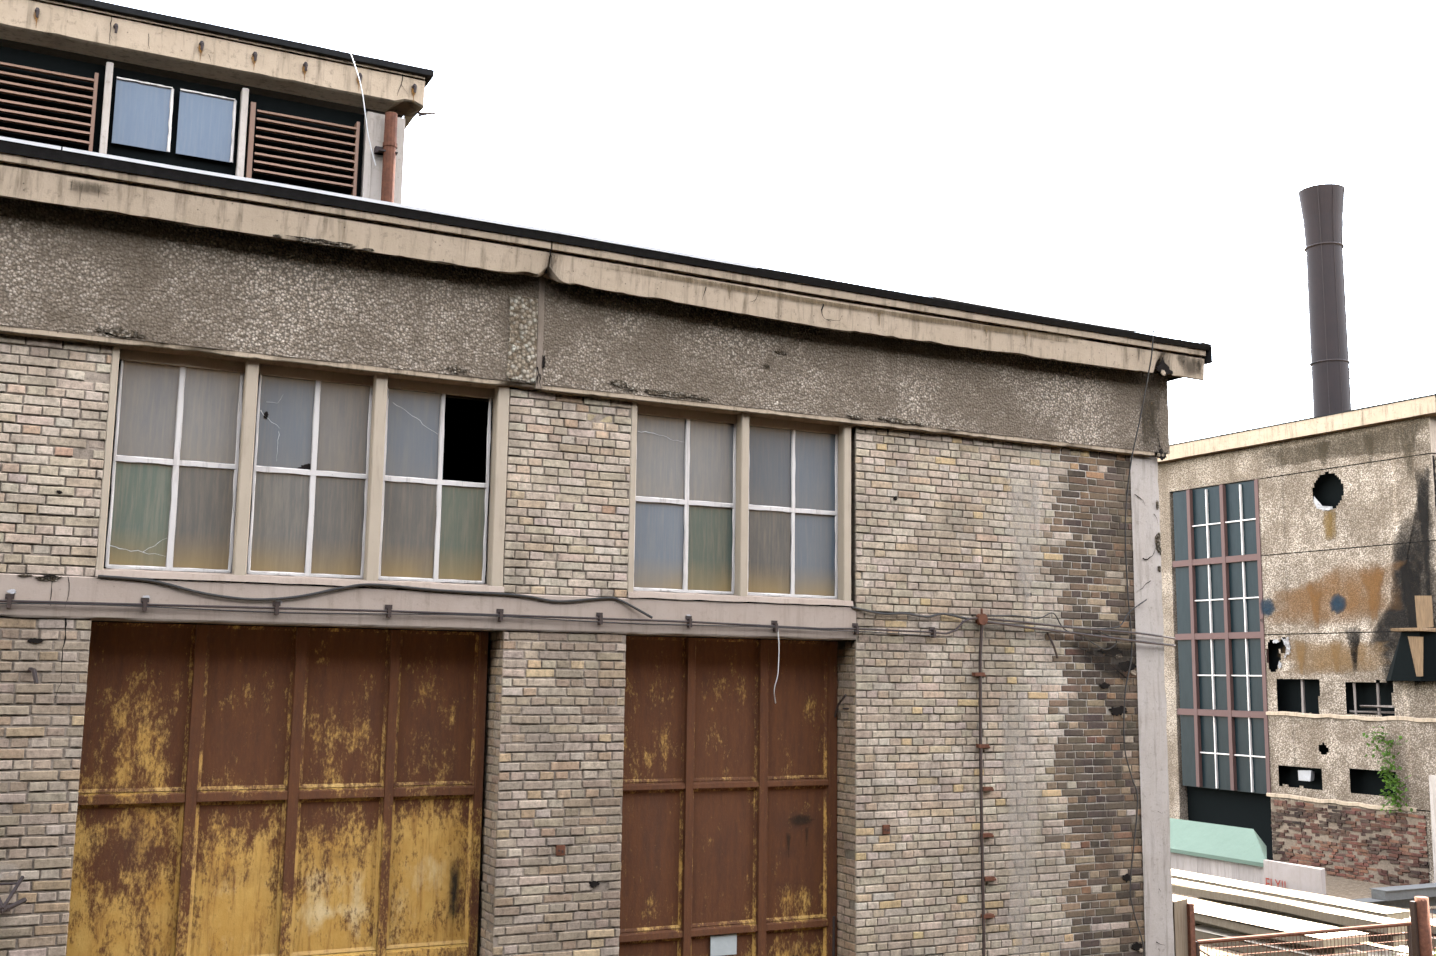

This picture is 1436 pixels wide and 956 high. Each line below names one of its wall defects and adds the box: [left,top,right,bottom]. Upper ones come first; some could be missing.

leakage [1346,630,1360,669]
rust [450,870,459,918]